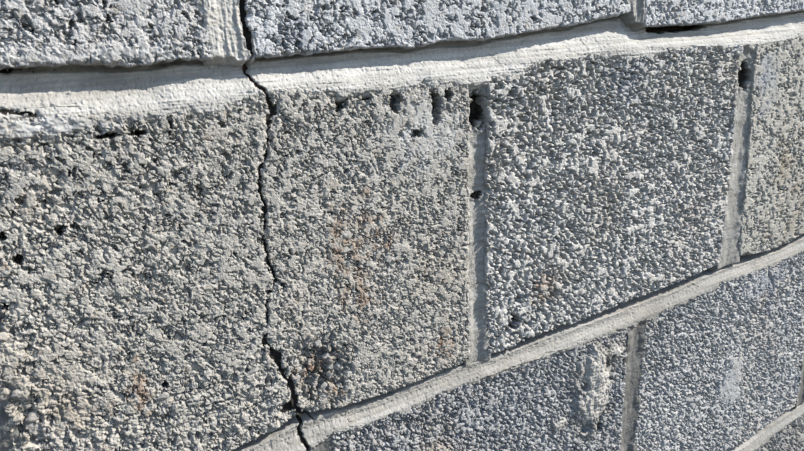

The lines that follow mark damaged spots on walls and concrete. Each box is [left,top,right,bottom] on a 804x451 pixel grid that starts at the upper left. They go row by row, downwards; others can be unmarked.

crack [239,0,317,451]